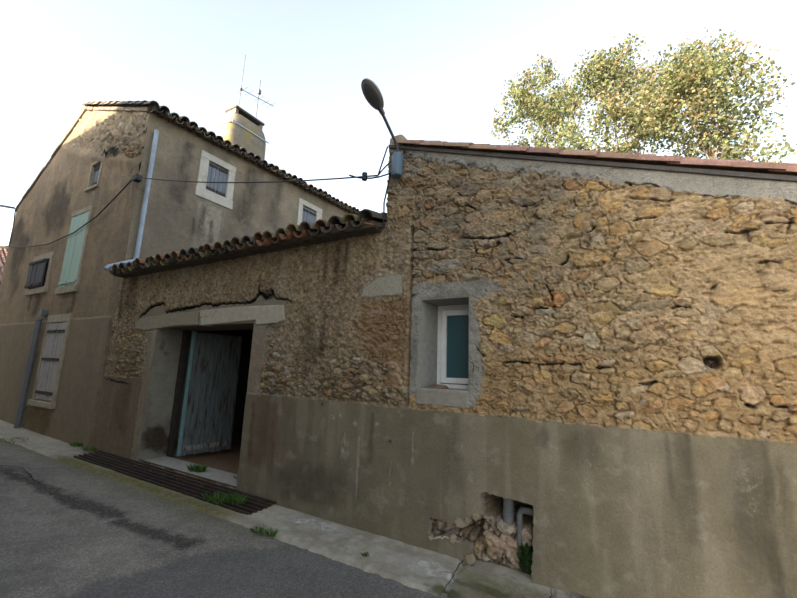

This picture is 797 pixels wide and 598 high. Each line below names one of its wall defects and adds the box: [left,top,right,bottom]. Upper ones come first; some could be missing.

crack [142,284,291,326]
spalling [427,492,534,582]